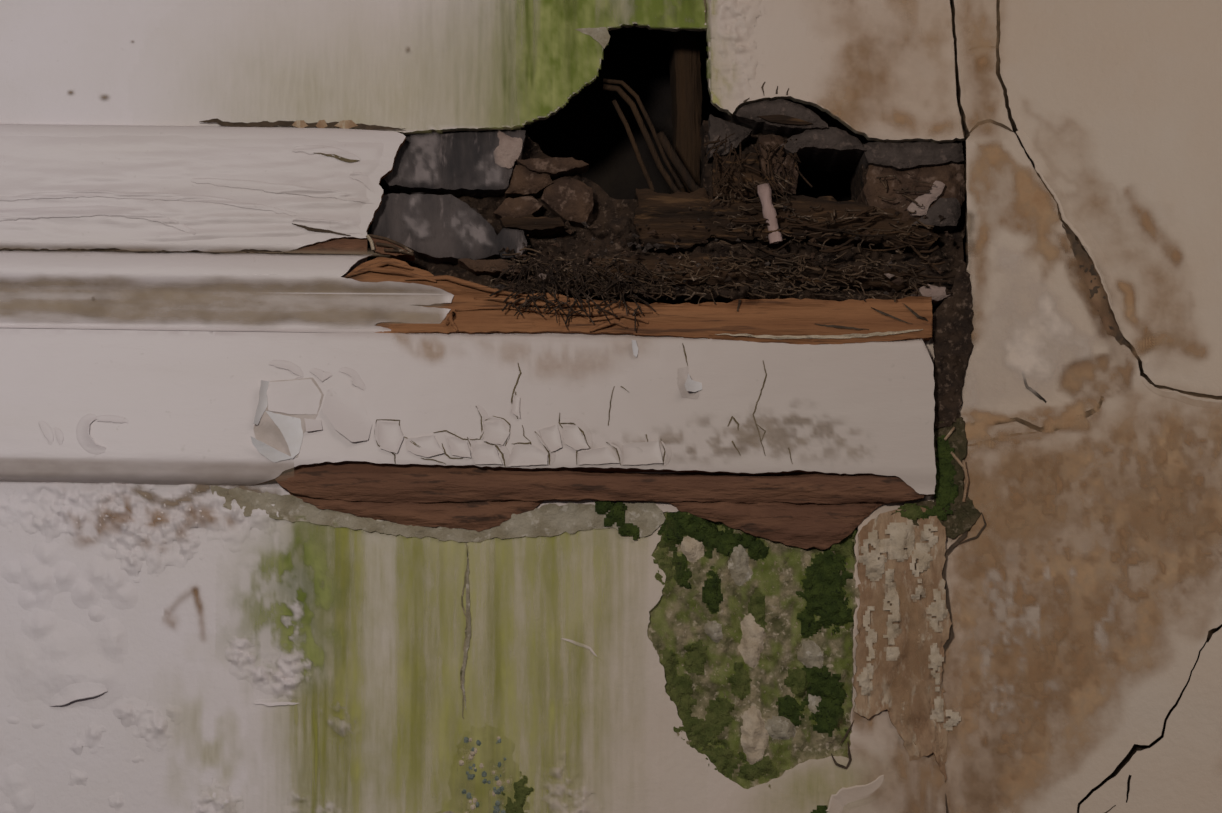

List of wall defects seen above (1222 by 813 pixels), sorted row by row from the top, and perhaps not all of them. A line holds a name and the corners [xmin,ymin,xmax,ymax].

peeling [575,27,610,49]
crack [0,223,351,254]
crack [200,118,405,163]
spalling [371,130,526,264]
spalling [856,162,965,221]
crack [950,0,1222,409]
damp [135,484,210,507]
flaking render [211,260,981,789]
damp [951,105,1222,813]
damp [225,592,315,700]
crack [1077,624,1222,813]
damp [524,751,604,813]